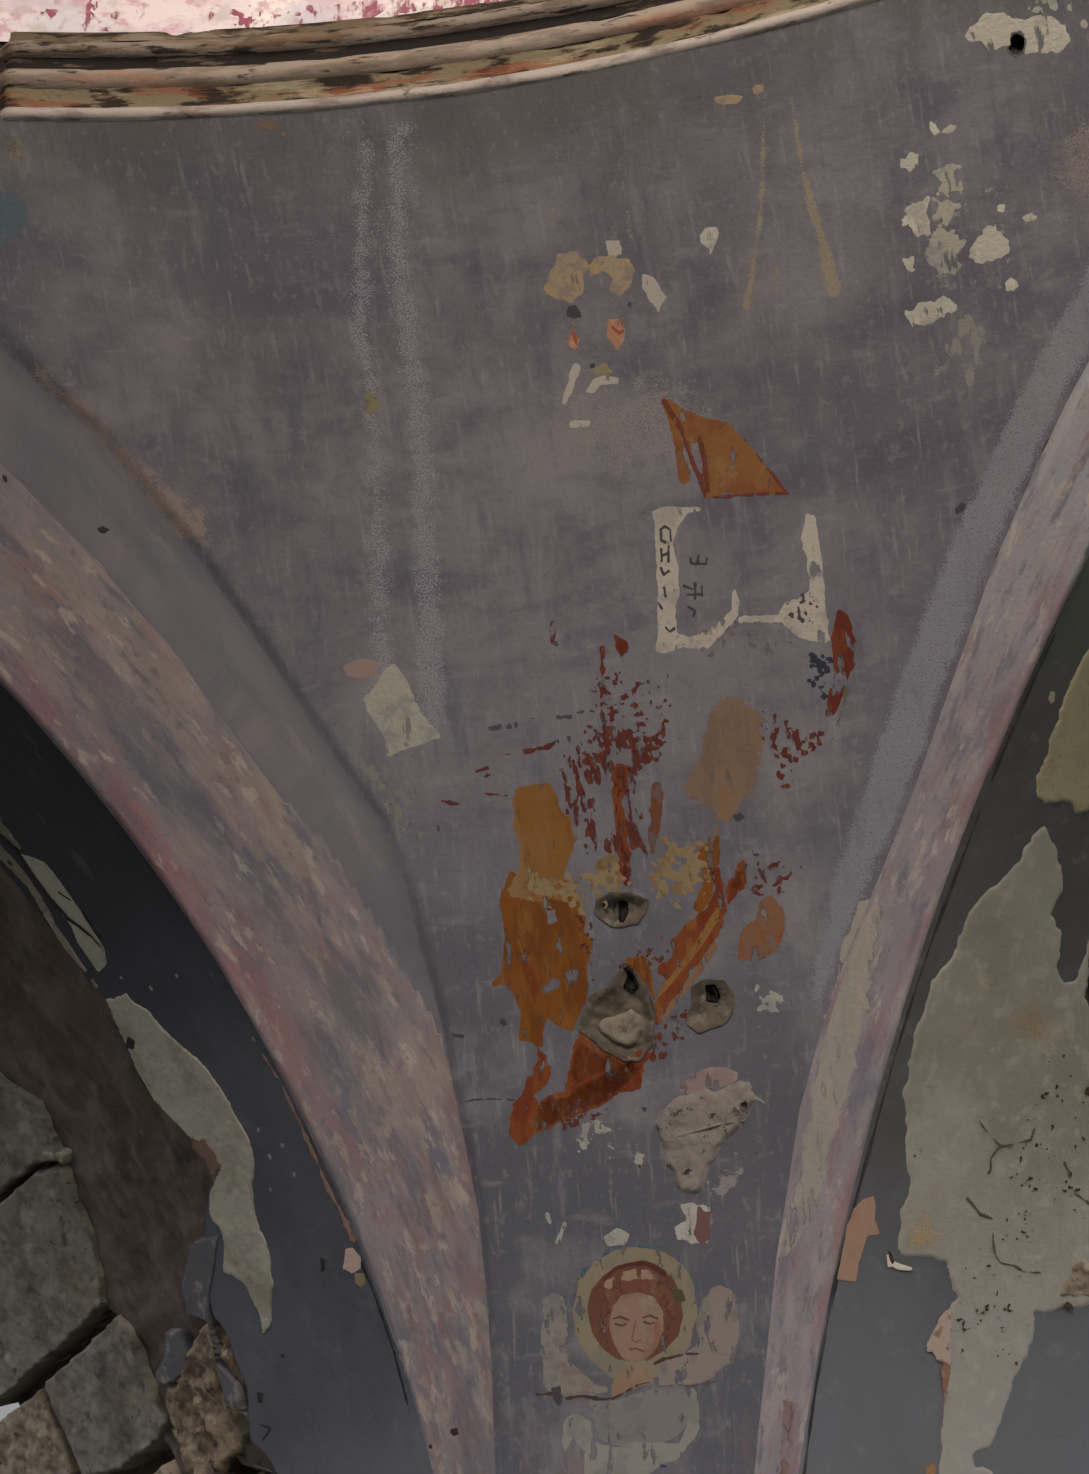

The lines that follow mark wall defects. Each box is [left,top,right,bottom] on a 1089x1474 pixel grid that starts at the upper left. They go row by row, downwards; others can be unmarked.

peeling [965,0,1088,57]
peeling [900,152,1037,386]
flaking render [343,658,441,841]
flaking render [1036,650,1089,814]
spalling [594,891,649,927]
peeling [0,817,274,1334]
spalling [579,963,656,1061]
spalling [686,979,735,1033]
crack [803,576,1083,1474]
flaking render [887,826,1089,1474]
peeling [837,1196,879,1282]
spalling [166,1324,274,1474]